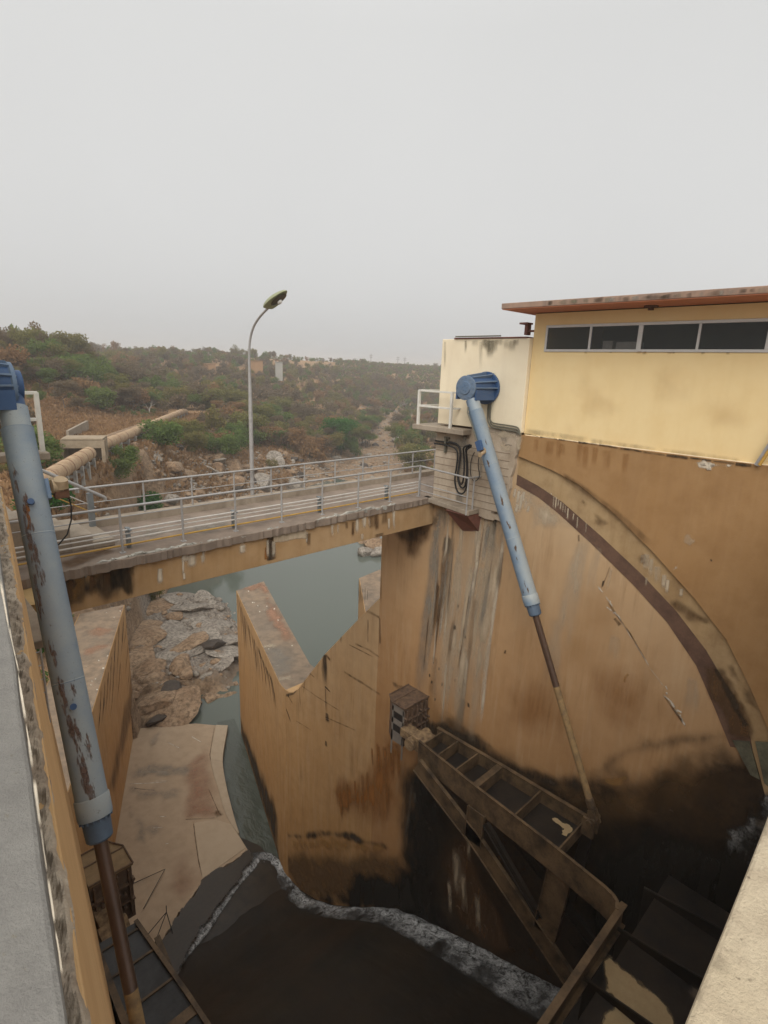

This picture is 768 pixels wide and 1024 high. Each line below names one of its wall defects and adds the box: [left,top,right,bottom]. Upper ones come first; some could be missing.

leakage [408,511,582,790]
crack [598,581,685,725]
leakage [293,832,386,850]
corrosion [336,745,400,816]